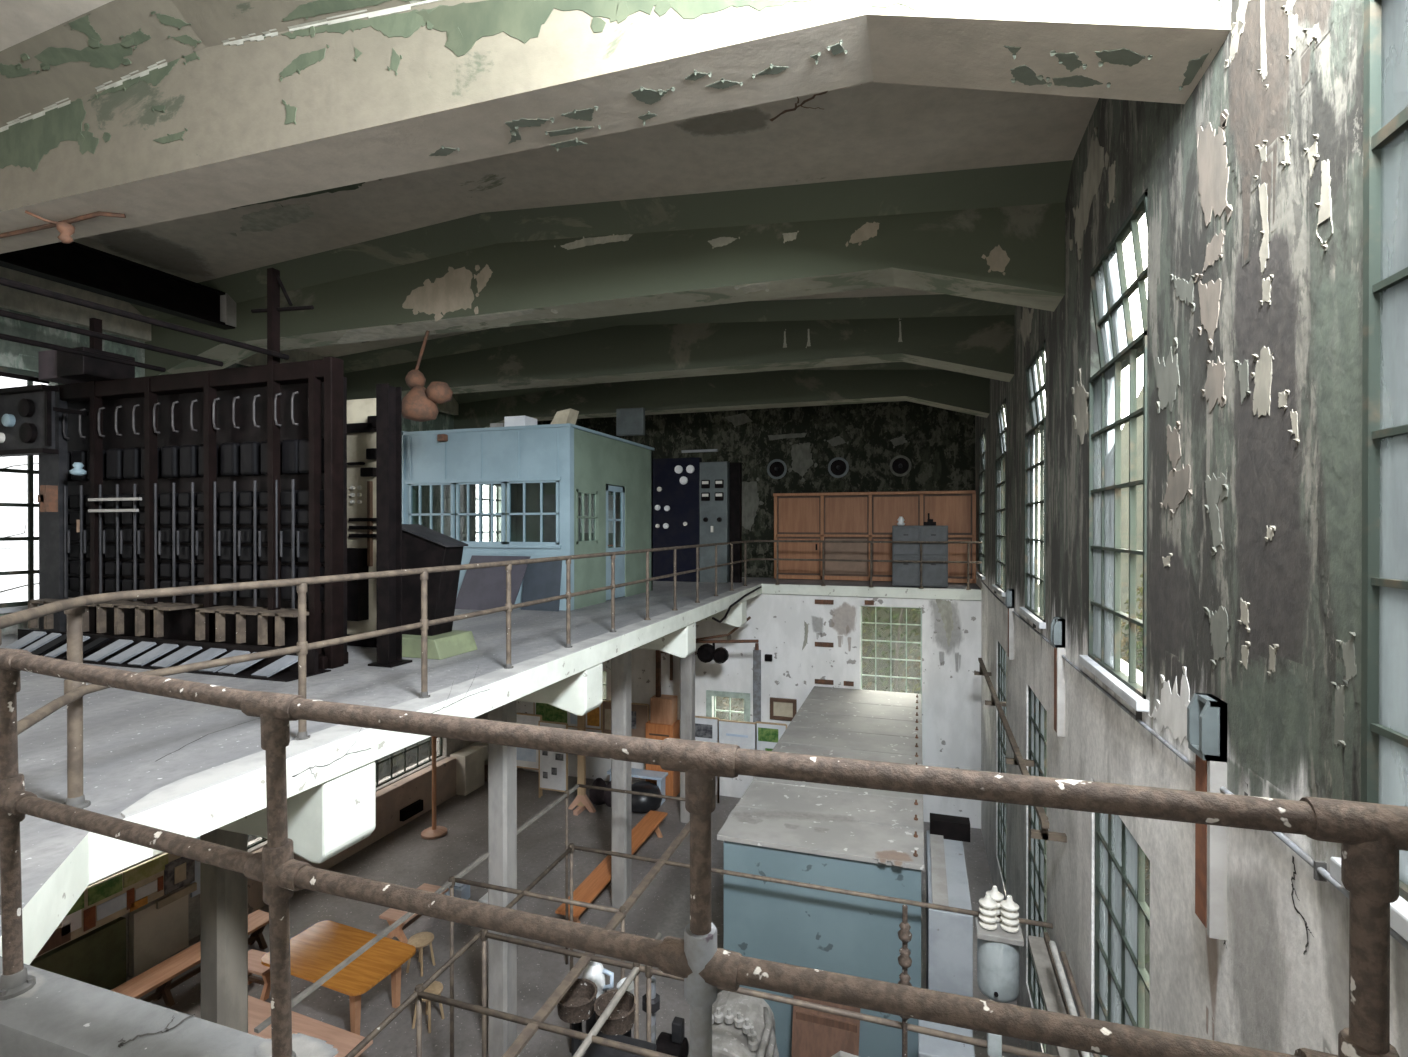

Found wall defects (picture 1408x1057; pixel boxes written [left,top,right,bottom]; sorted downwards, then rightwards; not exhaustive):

peeling [0,11,202,172]
peeling [262,0,812,81]
damp [672,104,776,139]
crack [770,84,862,121]
peeling [1004,45,1153,88]
peeling [1218,0,1269,90]
peeling [1253,134,1333,305]
peeling [333,264,558,345]
peeling [1170,109,1300,444]
damp [1221,0,1363,801]
damp [1148,534,1195,696]
crack [1291,856,1314,955]